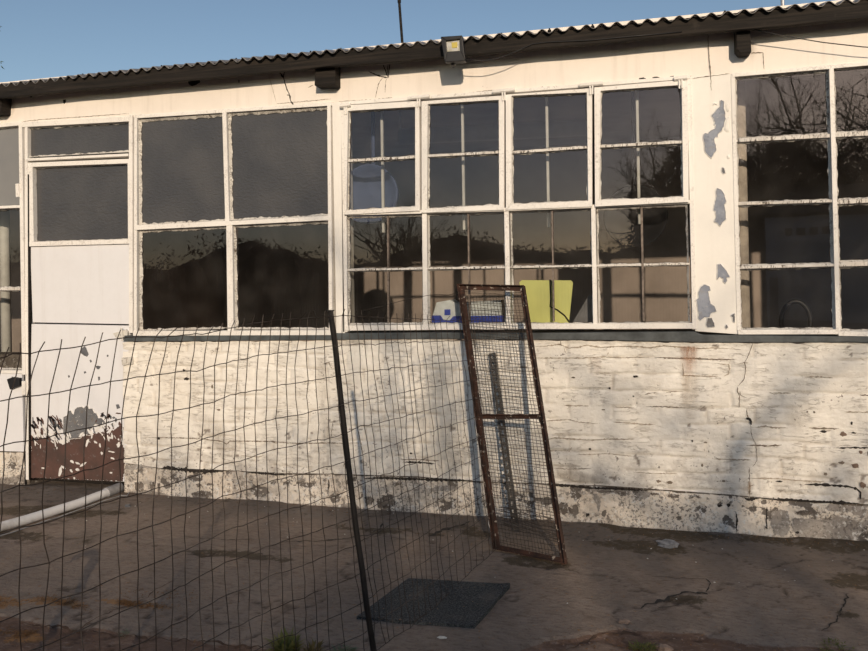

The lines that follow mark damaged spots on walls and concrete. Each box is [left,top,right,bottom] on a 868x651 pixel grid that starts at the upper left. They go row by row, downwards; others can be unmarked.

crack [693,40,725,90]
peeling [702,99,727,159]
peeling [713,188,727,227]
peeling [696,263,736,329]
peeling [31,404,153,482]
crack [536,340,868,528]
spalling [134,482,160,495]
spalling [559,502,574,515]
spalling [579,480,700,517]
spalling [771,509,845,539]
crack [641,576,711,608]
crack [821,594,849,631]